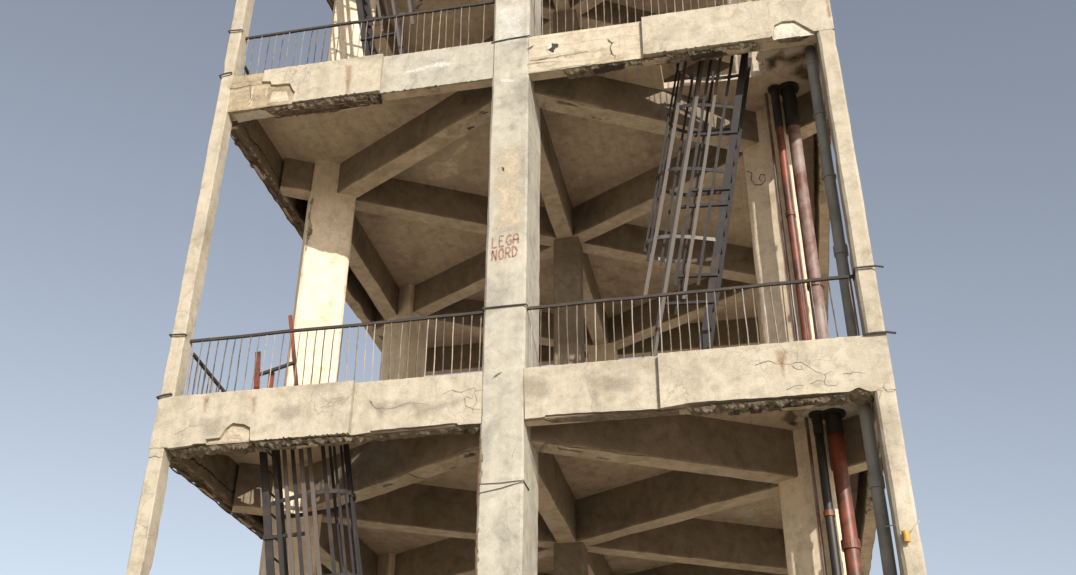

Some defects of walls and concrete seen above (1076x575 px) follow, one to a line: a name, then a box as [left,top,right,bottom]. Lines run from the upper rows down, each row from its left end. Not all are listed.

flaking render [527,22,814,79]
flaking render [228,74,383,251]
spalling [542,388,874,425]
crack [756,360,892,408]
peeling [539,443,647,464]
spalling [169,425,483,540]
spalling [865,486,875,517]